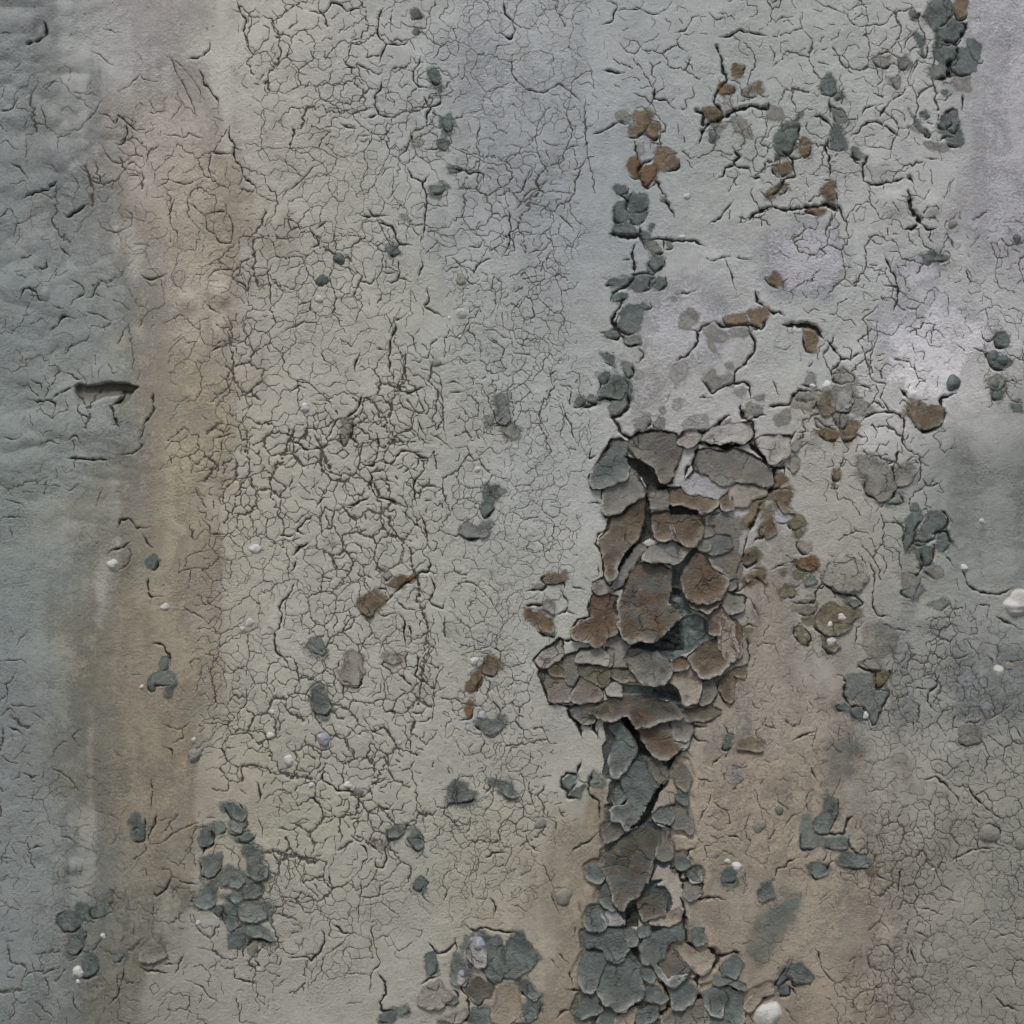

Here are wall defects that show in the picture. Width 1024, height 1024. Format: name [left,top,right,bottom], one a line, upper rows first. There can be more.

peeling [702,62,811,200]
peeling [872,0,983,152]
peeling [604,110,680,347]
peeling [679,306,770,353]
peeling [985,328,1024,412]
crack [0,0,671,1024]
peeling [458,484,506,542]
crack [601,0,1024,1024]
peeling [855,452,955,610]
peeling [523,352,899,1024]
peeling [181,802,276,957]
peeling [377,930,544,1024]